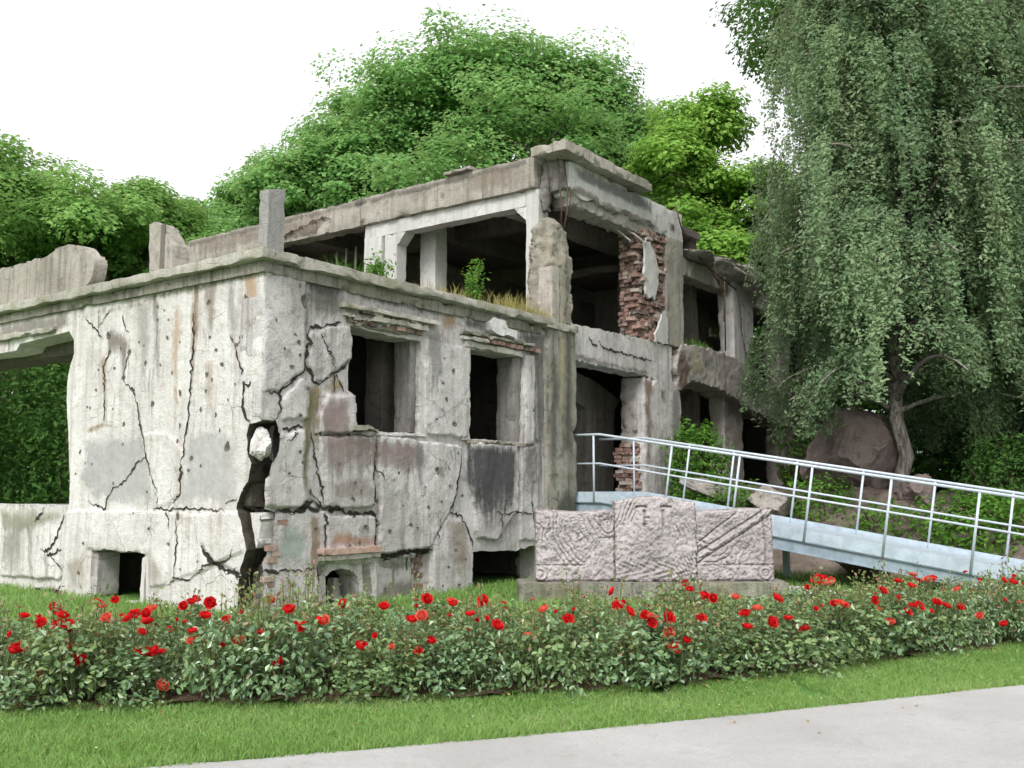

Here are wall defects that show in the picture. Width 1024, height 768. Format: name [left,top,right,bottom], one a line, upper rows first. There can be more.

peeling [642,241,659,300]
crack [589,336,652,361]
peeling [654,313,669,345]
crack [86,305,473,585]
crack [35,507,64,593]